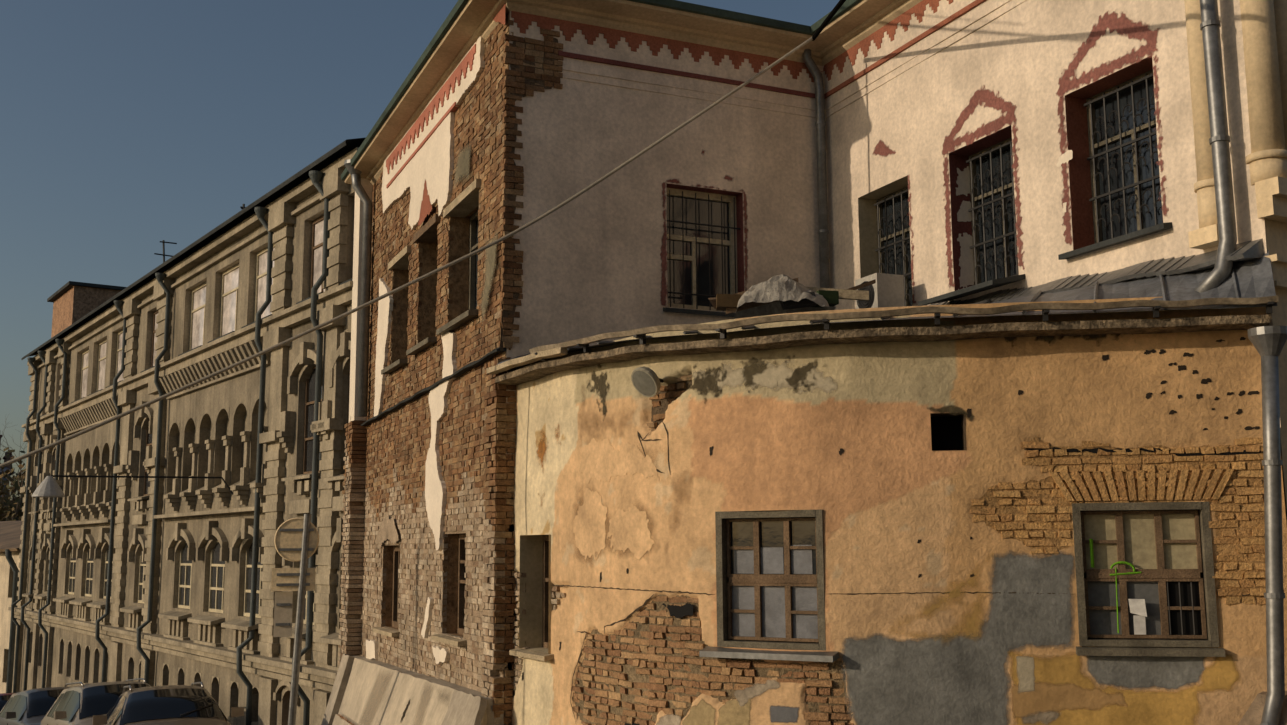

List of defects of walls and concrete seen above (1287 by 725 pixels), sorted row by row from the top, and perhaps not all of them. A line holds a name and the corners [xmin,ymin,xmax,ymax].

spalling [500,29,564,351]
peeling [1057,150,1073,167]
peeling [956,166,975,290]
damp [587,364,609,415]
damp [686,365,727,400]
peeling [646,361,837,432]
damp [742,358,767,388]
damp [785,356,817,391]
flaking render [970,349,1266,605]
flaking render [571,594,854,725]